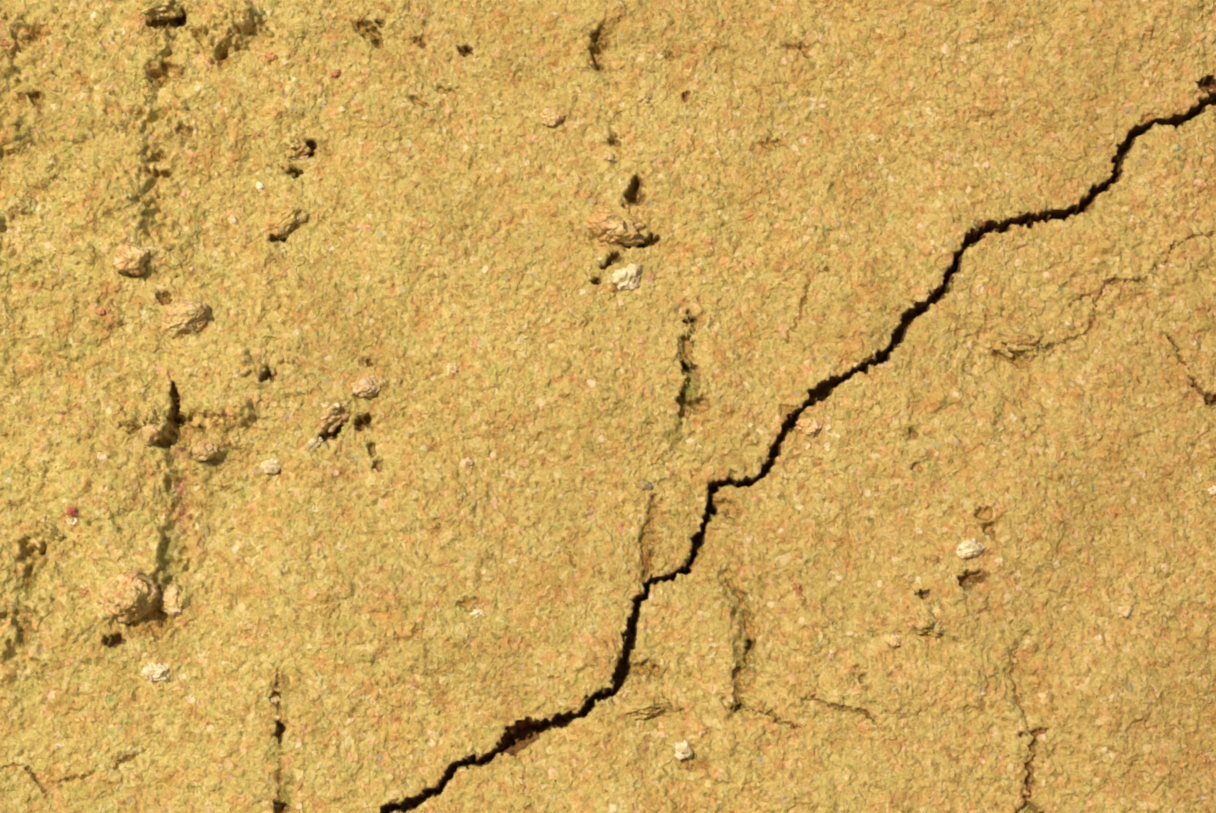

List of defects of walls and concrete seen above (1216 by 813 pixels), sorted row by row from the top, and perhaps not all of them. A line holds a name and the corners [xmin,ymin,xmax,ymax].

crack [168,373,185,428]
crack [380,75,1216,813]
crack [269,669,290,813]